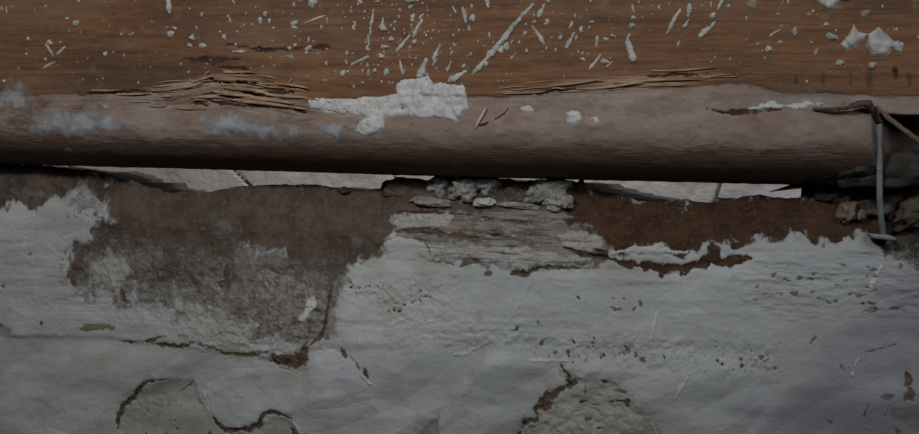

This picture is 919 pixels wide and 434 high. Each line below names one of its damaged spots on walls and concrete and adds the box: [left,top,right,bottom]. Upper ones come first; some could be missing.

spalling [0,164,919,349]
crack [124,335,307,369]
spalling [121,380,294,434]
spalling [521,339,655,434]
spalling [904,372,915,401]